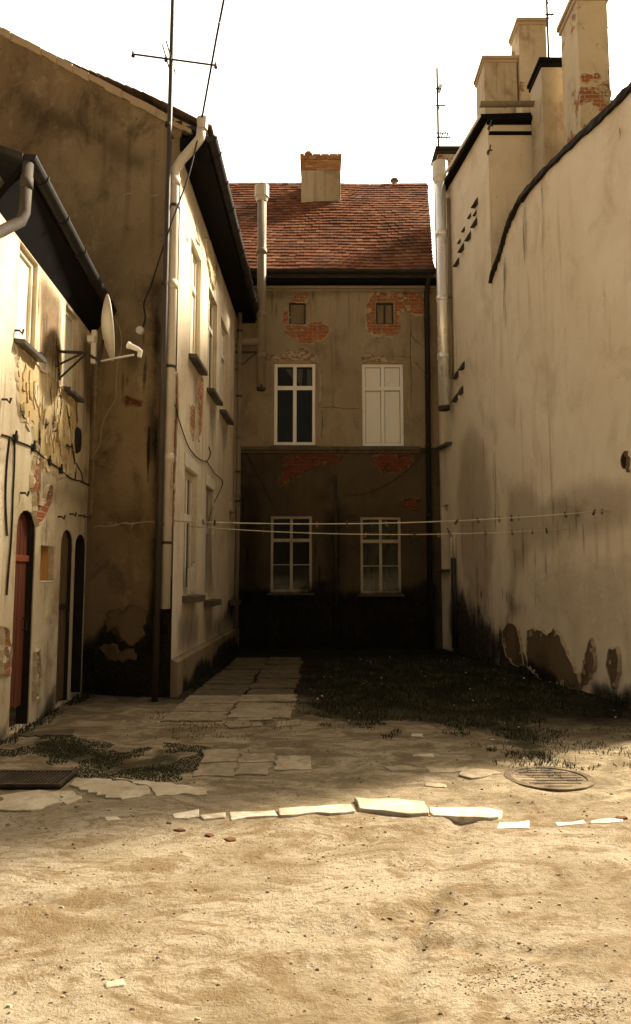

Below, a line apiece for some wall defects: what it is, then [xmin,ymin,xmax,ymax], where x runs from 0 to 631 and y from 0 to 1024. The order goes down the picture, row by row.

flaking render [579,73,612,105]
flaking render [268,292,331,363]
flaking render [364,292,424,339]
flaking render [14,343,78,528]
flaking render [0,625,13,678]
spalling [99,602,150,663]
leakage [449,591,558,683]
spalling [502,622,622,691]
leakage [590,685,631,706]